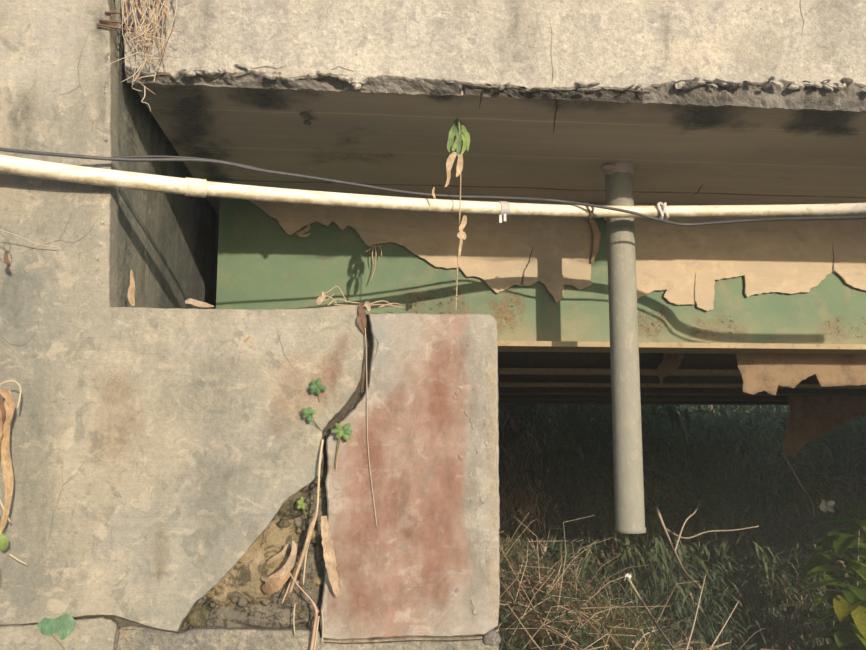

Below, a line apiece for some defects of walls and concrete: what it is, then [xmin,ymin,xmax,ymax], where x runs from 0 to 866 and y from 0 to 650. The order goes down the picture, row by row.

rust [97,11,134,32]
spalling [125,64,866,112]
crack [550,25,558,133]
peeling [427,198,606,206]
peeling [249,200,606,303]
peeling [634,216,866,312]
crack [296,312,379,486]
crack [73,615,185,650]